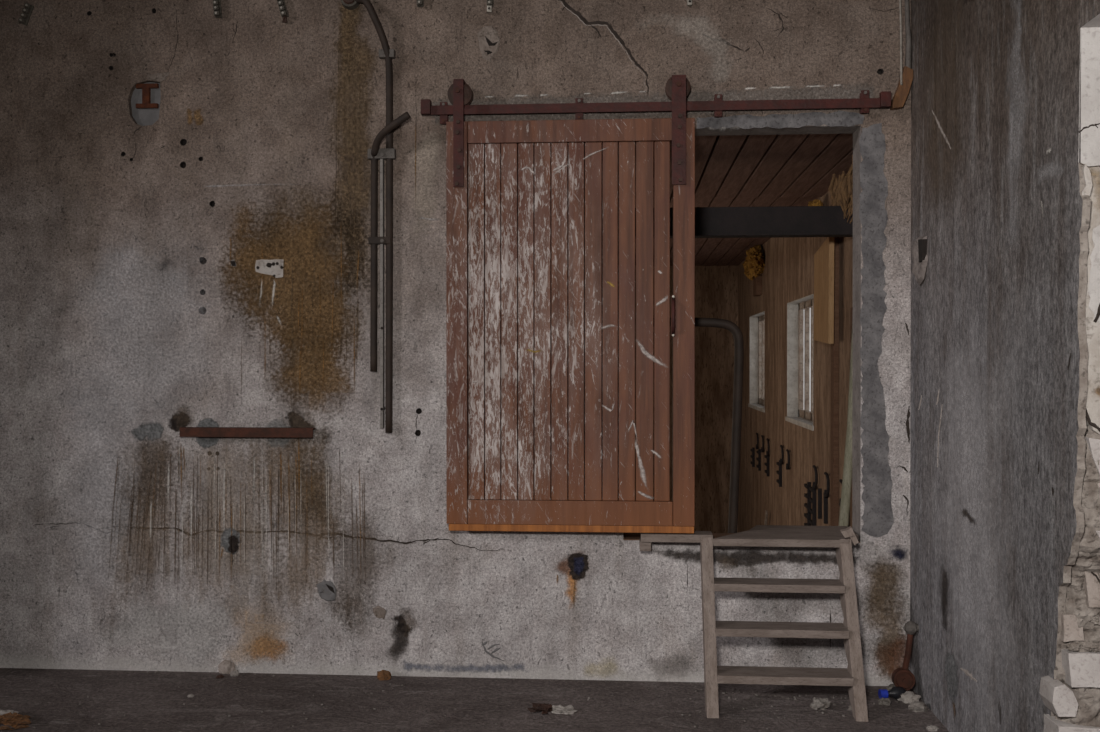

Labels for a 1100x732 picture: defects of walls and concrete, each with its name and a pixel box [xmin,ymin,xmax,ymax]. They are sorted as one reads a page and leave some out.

crack [561,0,649,98]
rust [225,192,370,414]
flaking render [1039,164,1100,732]
crack [33,522,505,552]
rust [557,553,589,605]